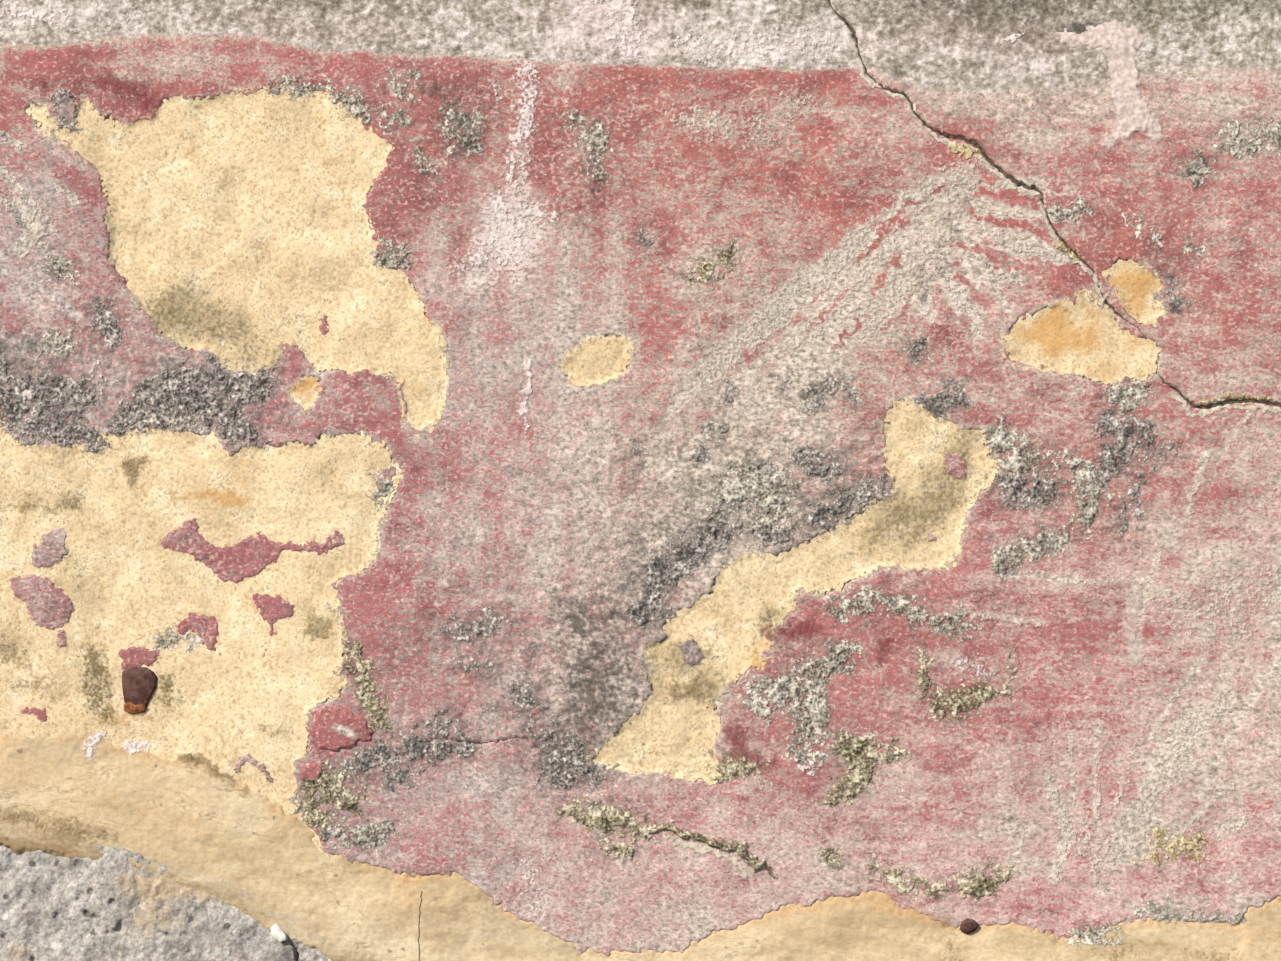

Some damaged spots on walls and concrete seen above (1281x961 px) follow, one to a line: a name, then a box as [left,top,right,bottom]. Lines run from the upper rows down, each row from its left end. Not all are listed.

spalling [25,83,450,442]
spalling [557,332,634,386]
crack [829,0,1281,418]
spalling [999,259,1166,389]
spalling [0,409,405,860]
spalling [585,396,1000,785]
peeling [271,924,288,942]